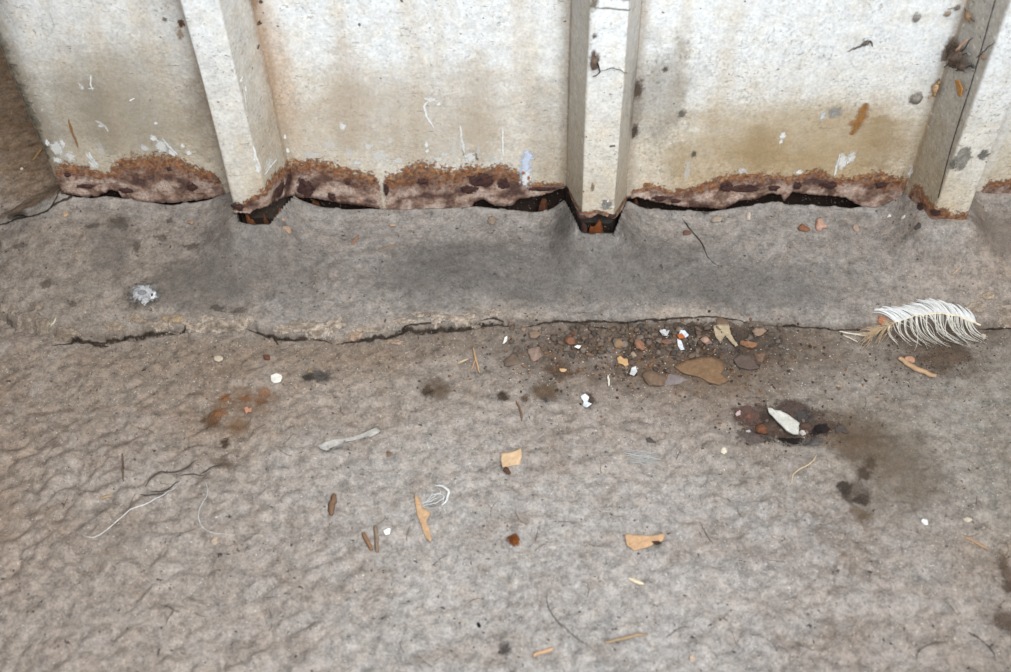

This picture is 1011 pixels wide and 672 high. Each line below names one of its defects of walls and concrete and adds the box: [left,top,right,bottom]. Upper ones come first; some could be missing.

rust [55,151,225,203]
rust [231,157,969,220]
rust [981,179,1011,194]
crack [52,326,186,347]
crack [246,316,868,345]